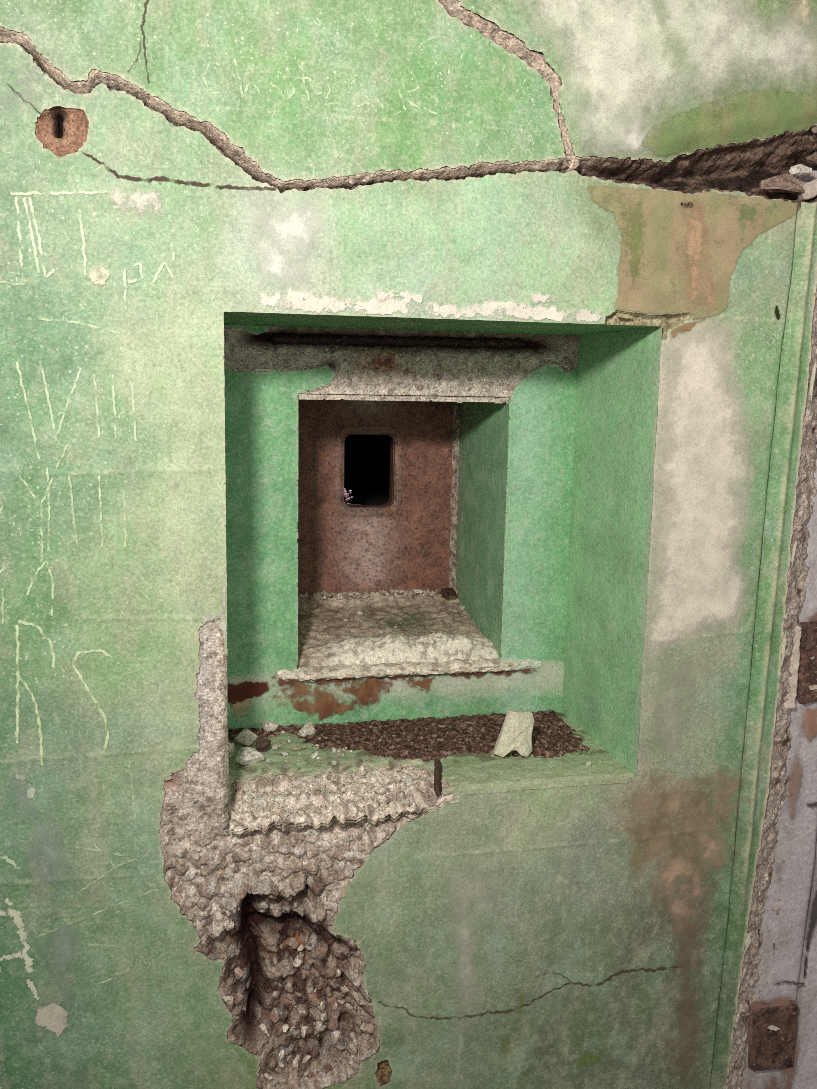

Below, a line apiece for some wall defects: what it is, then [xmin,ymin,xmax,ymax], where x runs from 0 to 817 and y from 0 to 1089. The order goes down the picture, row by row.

spalling [35,106,89,158]
crack [0,0,817,209]
leakage [528,0,817,157]
spalling [224,287,692,404]
leakage [587,185,798,657]
corrosion [228,675,432,720]
corrosion [445,668,536,679]
spalling [728,287,817,1089]
peeling [16,774,36,799]
spalling [159,571,460,1089]
peeling [0,898,69,1038]
crack [378,966,682,1020]